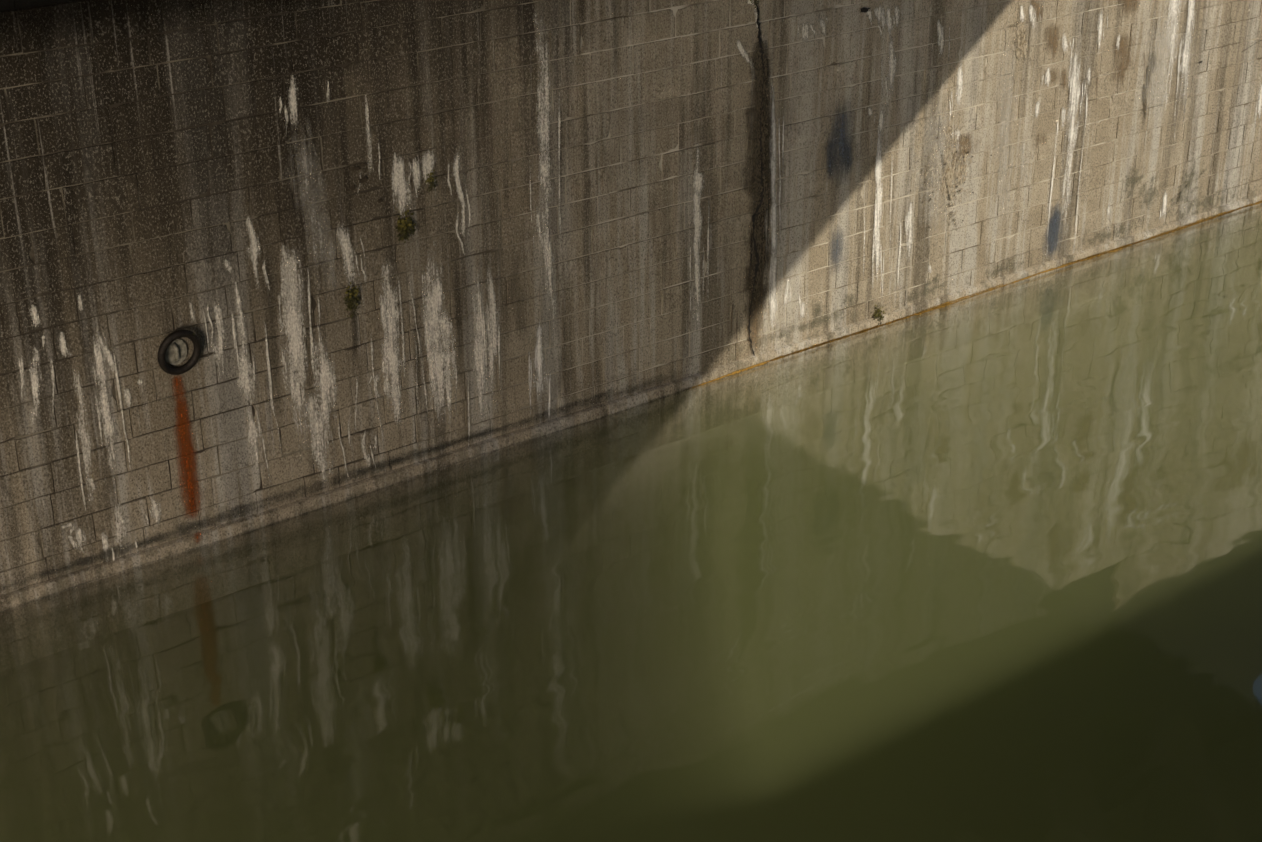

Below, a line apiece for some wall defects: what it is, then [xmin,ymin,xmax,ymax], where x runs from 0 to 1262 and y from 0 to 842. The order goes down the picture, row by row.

water stain [279,79,297,123]
water stain [365,100,434,215]
water stain [447,155,471,255]
water stain [530,46,561,318]
water stain [688,0,1262,389]
water stain [190,218,500,478]
water stain [529,324,551,415]
corrosion [174,377,199,516]